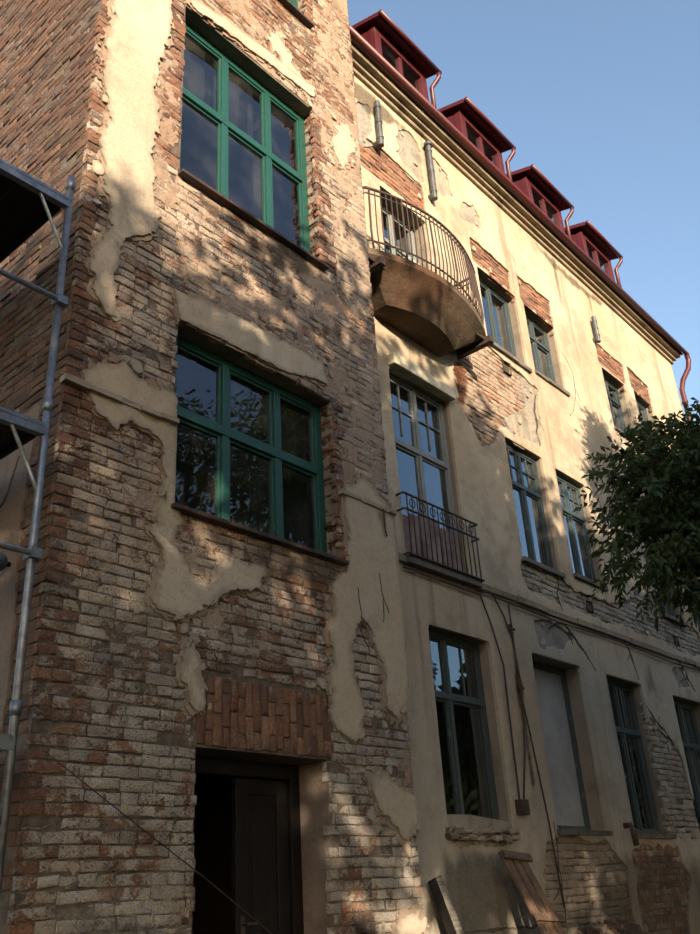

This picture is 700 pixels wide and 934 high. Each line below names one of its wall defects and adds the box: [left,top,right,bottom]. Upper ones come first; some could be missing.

flaking render [186,0,317,108]
flaking render [83,0,176,325]
flaking render [171,289,333,386]
flaking render [453,347,542,451]
flaking render [79,352,270,717]
flaking render [316,472,409,743]
flaking render [520,562,700,656]
flaking render [364,764,419,858]
flaking render [447,814,511,848]
flaking render [543,703,700,934]
flaking render [381,904,429,934]